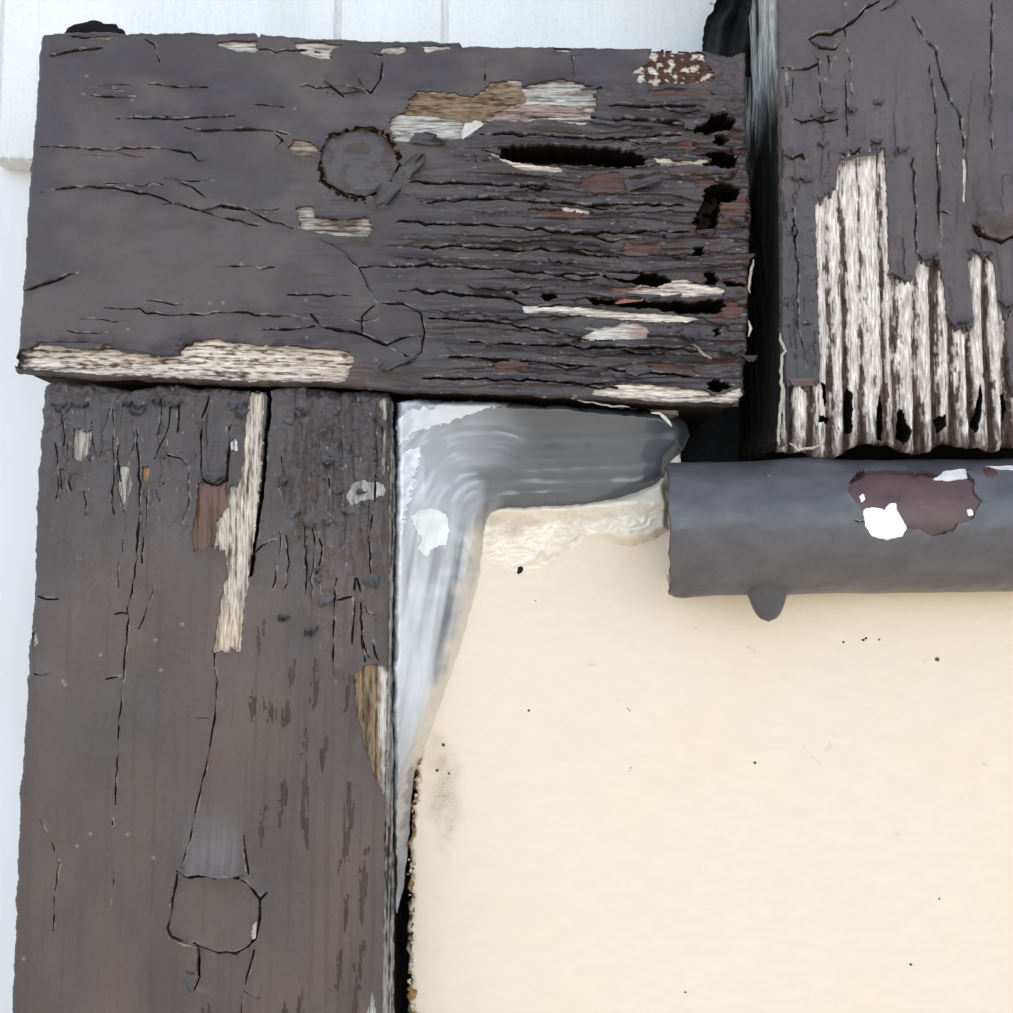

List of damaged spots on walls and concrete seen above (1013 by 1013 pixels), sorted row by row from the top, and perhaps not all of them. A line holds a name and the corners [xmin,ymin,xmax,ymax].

peeling [390,80,602,145]
crack [783,2,886,158]
crack [910,25,964,248]
crack [58,116,698,390]
peeling [497,273,747,359]
peeling [583,362,743,403]
peeling [775,138,1013,460]
crack [92,399,231,680]
peeling [17,339,354,654]
crack [273,474,379,663]
peeling [848,469,981,540]
crack [167,653,268,993]